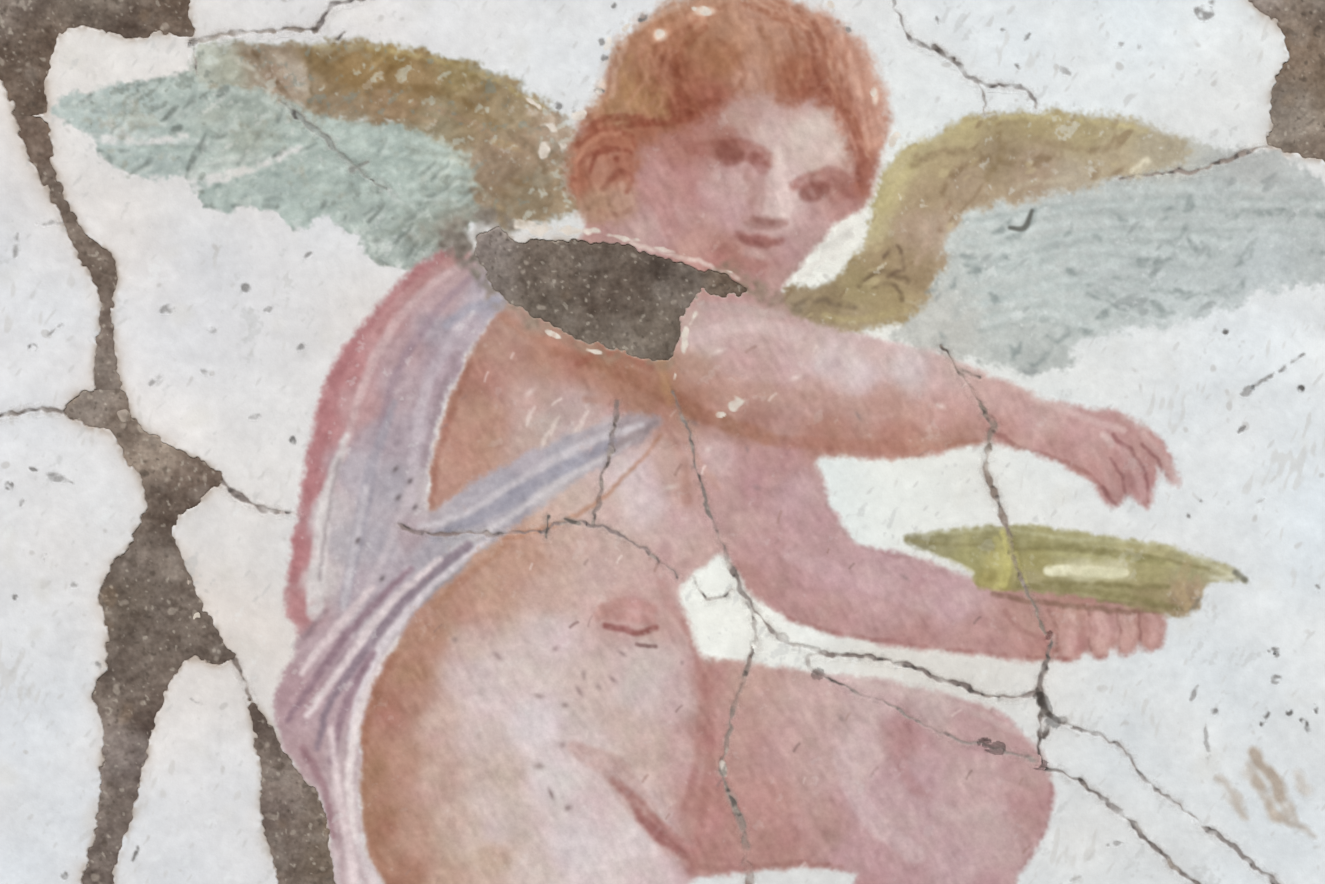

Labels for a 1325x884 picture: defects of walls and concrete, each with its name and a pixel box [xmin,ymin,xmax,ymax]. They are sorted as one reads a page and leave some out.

crack [887,0,1042,122]
spalling [1191,0,1216,22]
spalling [1248,0,1325,162]
spalling [400,201,867,381]
crack [0,400,67,424]
spalling [1238,351,1306,399]
crack [391,340,1287,884]